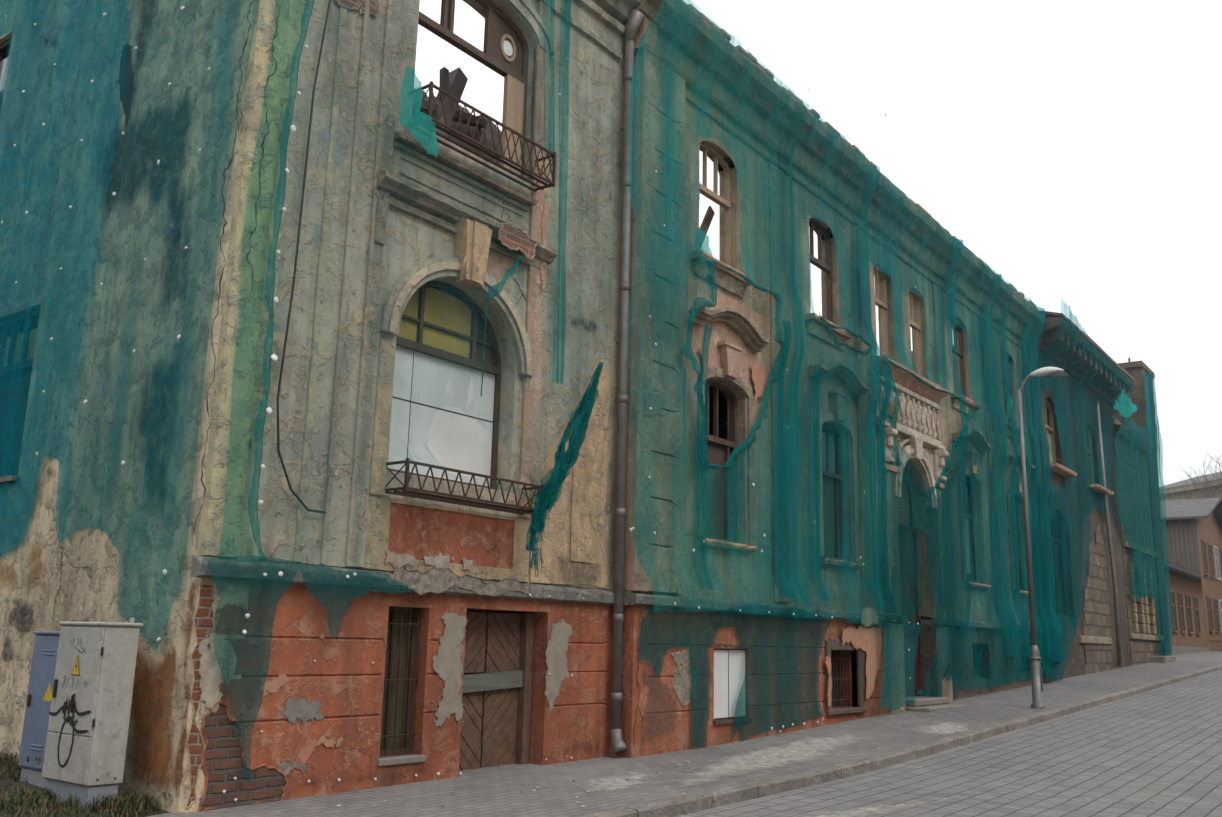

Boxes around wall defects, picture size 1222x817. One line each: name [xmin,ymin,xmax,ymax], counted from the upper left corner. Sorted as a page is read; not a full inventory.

spalling [335,0,379,17]
damp [103,0,189,302]
crack [192,0,280,544]
damp [138,363,176,504]
spalling [184,582,307,812]
peeling [432,612,467,734]
spalling [371,530,534,599]
peeling [545,619,573,718]
peeling [841,607,882,699]
flaking render [1082,521,1114,675]